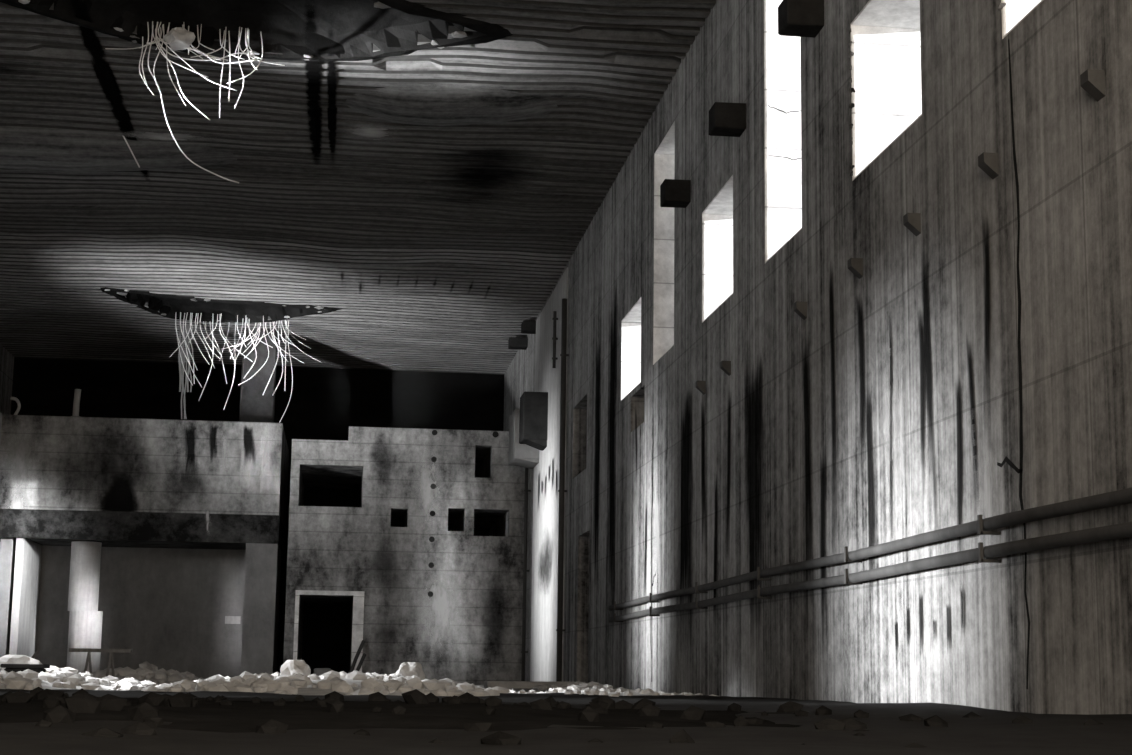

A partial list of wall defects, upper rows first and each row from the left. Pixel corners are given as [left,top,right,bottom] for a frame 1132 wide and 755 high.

spalling [0,0,513,183]
spalling [99,287,341,421]
leakage [11,441,30,509]
leakage [180,427,201,492]
leakage [210,426,225,458]
leakage [243,427,267,467]
leakage [420,466,437,515]
leakage [423,586,456,644]